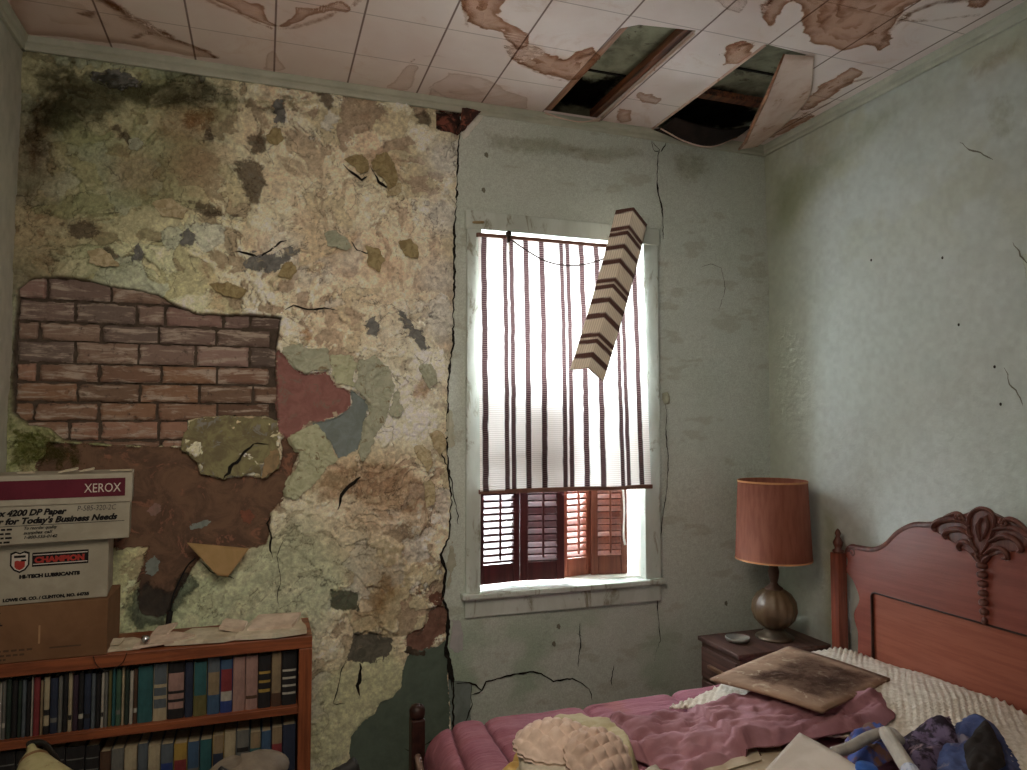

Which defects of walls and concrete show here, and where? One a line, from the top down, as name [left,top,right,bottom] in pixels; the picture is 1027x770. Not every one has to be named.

flaking render [415,107,484,140]
peeling [234,99,286,204]
peeling [345,152,402,198]
crack [652,143,666,235]
peeling [60,219,100,239]
peeling [243,245,300,280]
peeling [365,245,386,272]
peeling [399,238,419,258]
peeling [398,311,430,350]
flaking render [16,278,404,616]
crack [406,114,614,751]
crack [661,404,669,533]